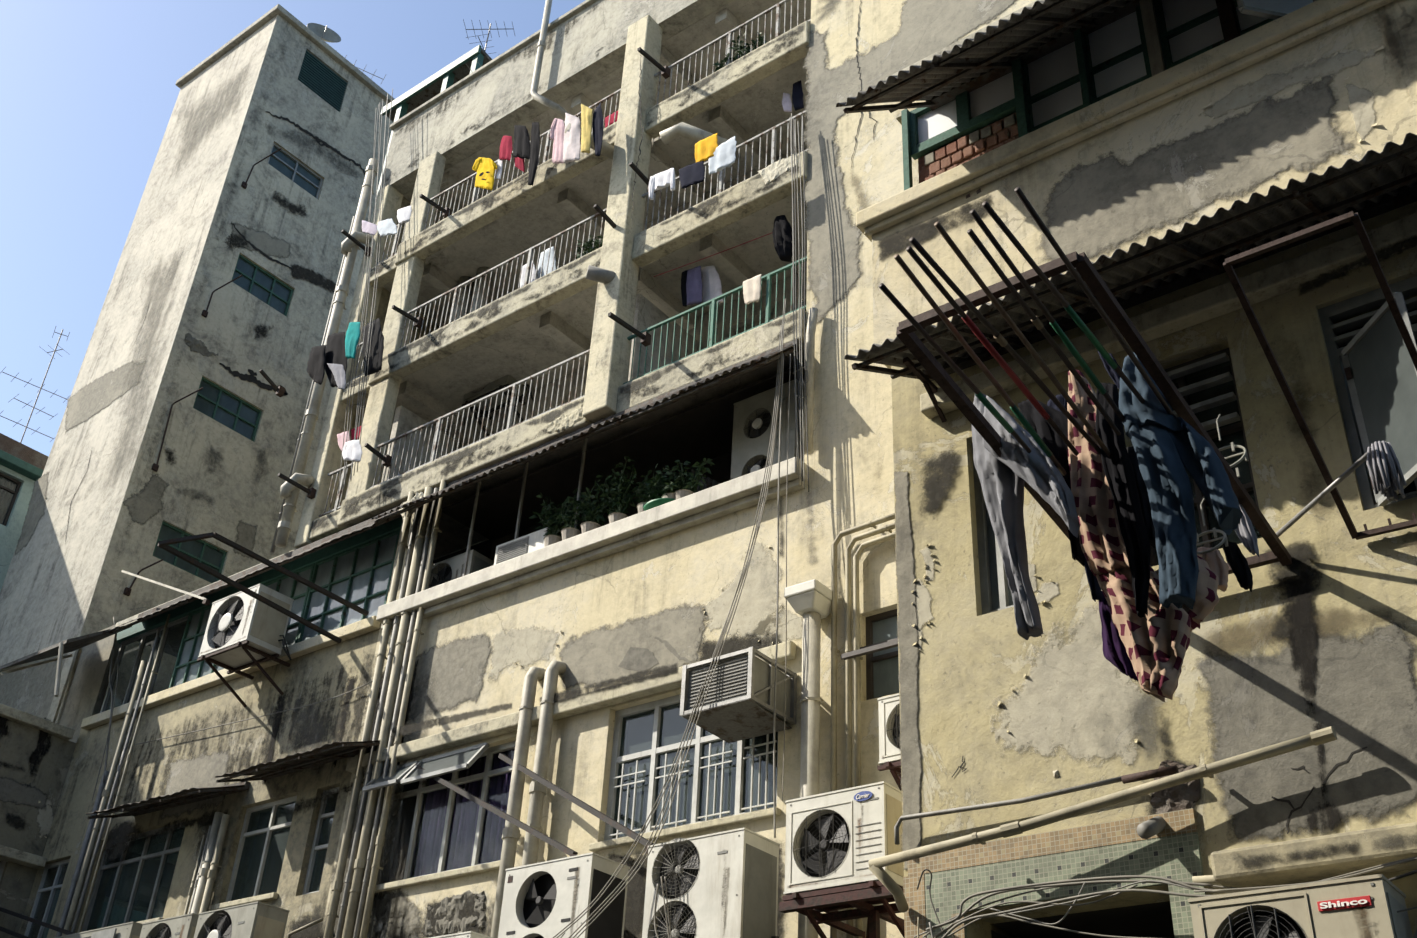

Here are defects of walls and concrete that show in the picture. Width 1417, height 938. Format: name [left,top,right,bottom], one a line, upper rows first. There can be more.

crack [265,111,366,175]
crack [851,0,878,168]
crack [219,363,288,396]
water stain [104,806,228,876]
water stain [106,655,512,808]
water stain [287,762,495,938]
peeling [618,637,692,672]
peeling [991,606,1150,778]
water stain [1205,541,1386,868]
crack [1271,747,1367,834]